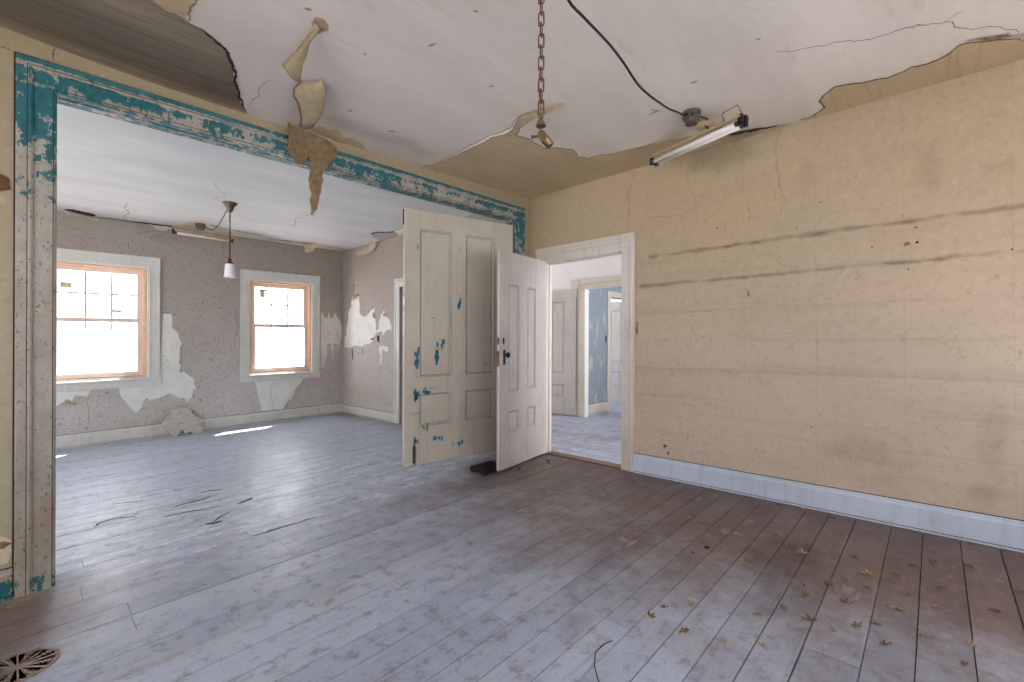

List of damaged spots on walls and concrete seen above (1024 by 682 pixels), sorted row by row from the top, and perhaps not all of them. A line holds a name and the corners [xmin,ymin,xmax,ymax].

peeling [0,0,247,114]
crack [782,11,1019,52]
peeling [281,8,365,215]
peeling [422,34,1024,199]
peeling [119,313,196,413]
peeling [255,379,303,411]
peeling [321,282,392,368]